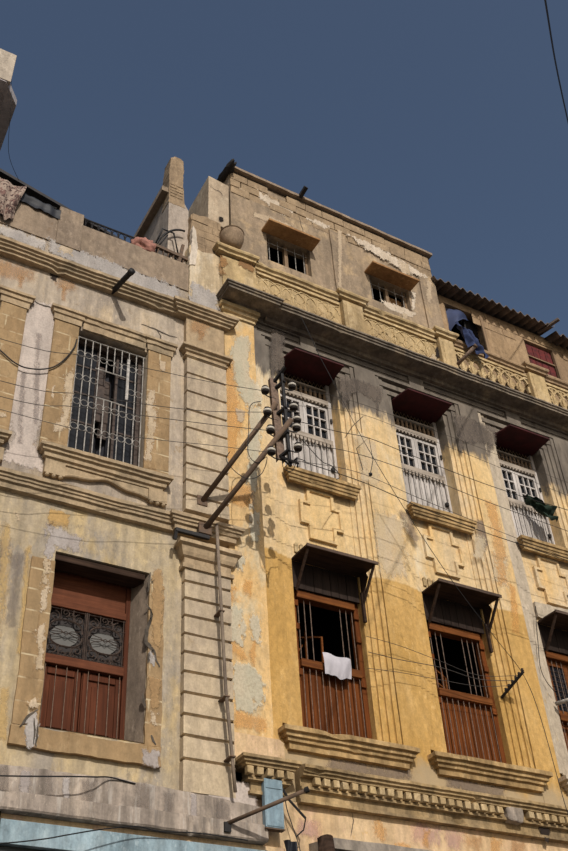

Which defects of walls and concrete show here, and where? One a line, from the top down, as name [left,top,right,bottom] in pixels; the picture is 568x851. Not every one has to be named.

flaking render [346,234,433,304]
flaking render [381,292,416,319]
peeling [39,524,82,613]
peeling [35,623,46,673]
crack [144,572,160,667]
peeling [230,603,262,646]
peeling [232,662,266,713]
spalling [24,698,39,749]